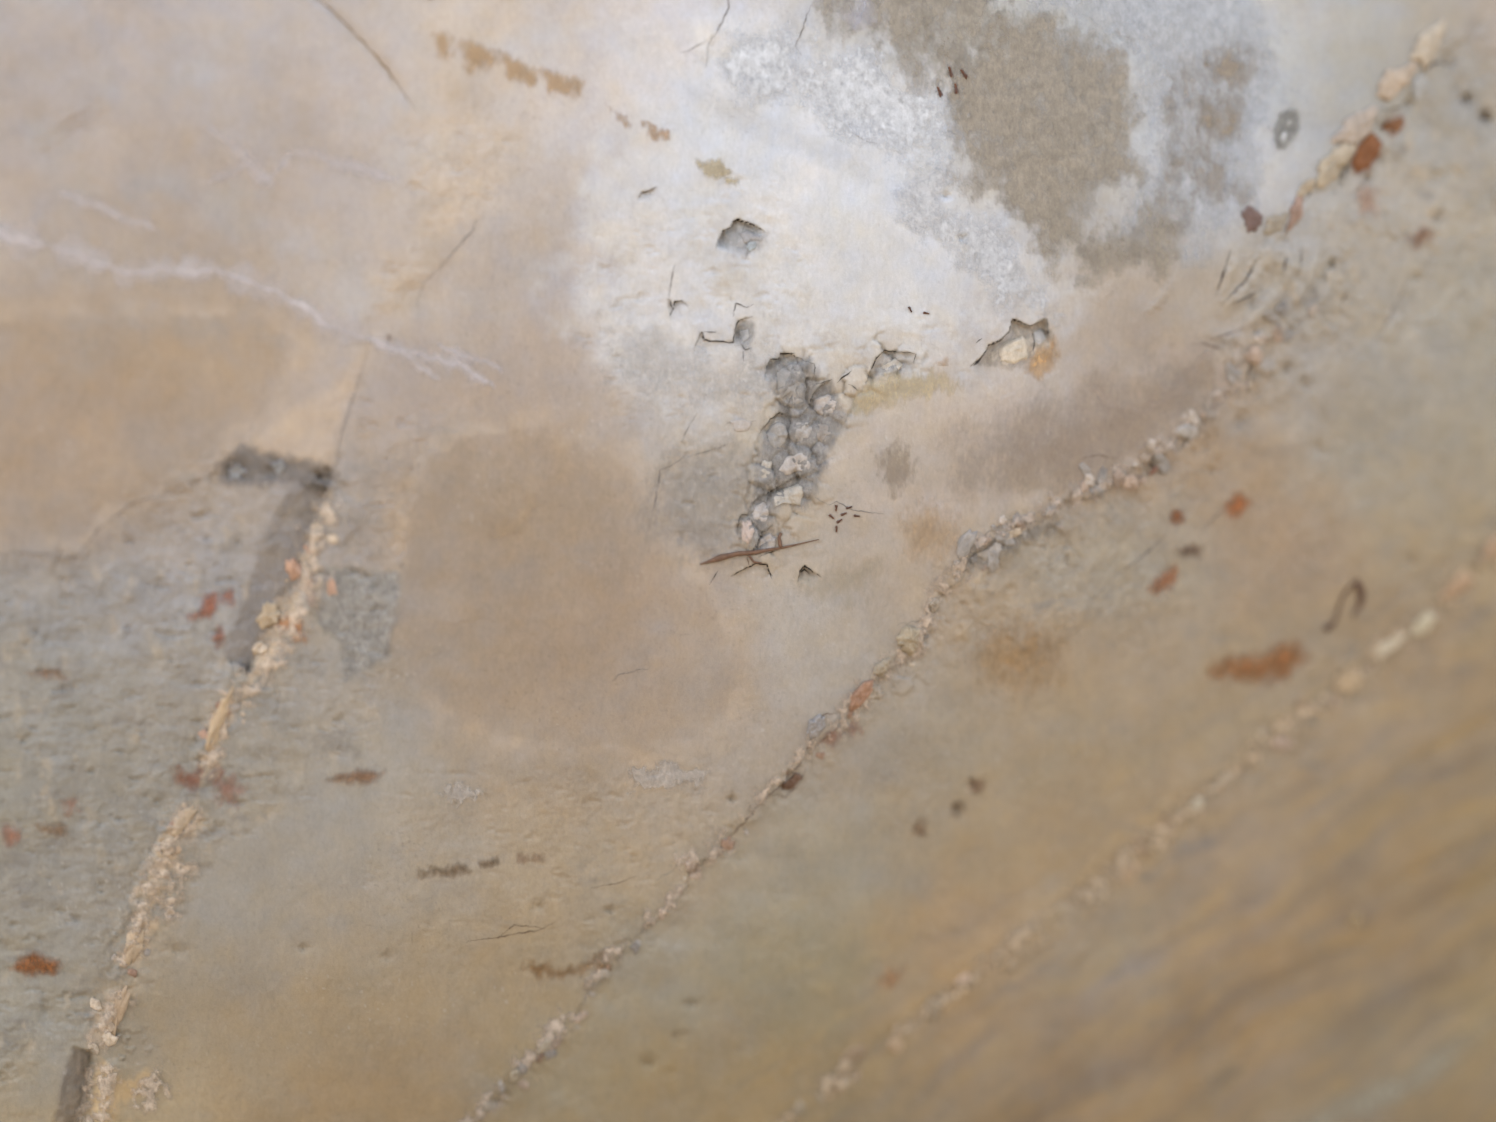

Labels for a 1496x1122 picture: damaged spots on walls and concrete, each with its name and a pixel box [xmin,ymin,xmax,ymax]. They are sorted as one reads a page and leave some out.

crack [682,0,729,68]
damp [724,0,1271,311]
spalling [987,327,1050,365]
spalling [224,448,324,487]
peeling [285,557,303,582]
peeling [252,640,269,655]
crack [471,219,1307,1122]
rust [1217,645,1298,679]
peeling [90,997,103,1012]
peeling [86,1031,119,1055]